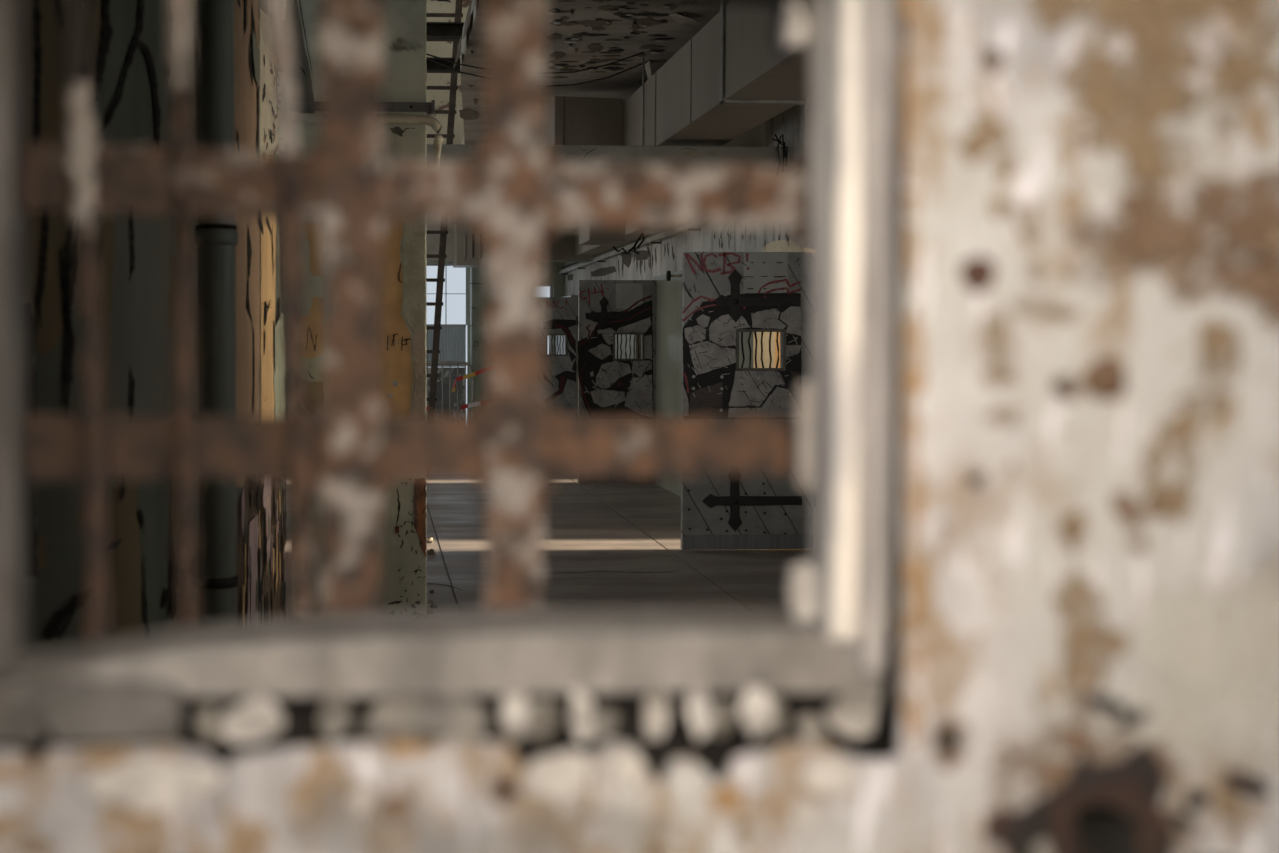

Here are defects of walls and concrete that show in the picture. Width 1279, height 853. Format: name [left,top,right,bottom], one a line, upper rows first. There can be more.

crack [95,0,161,147]
peeling [546,0,706,79]
crack [36,211,78,413]
rust [1060,512,1085,553]
rust [1053,574,1128,709]
spalling [350,788,408,819]
rust [1047,782,1210,853]
rust [1224,769,1270,798]